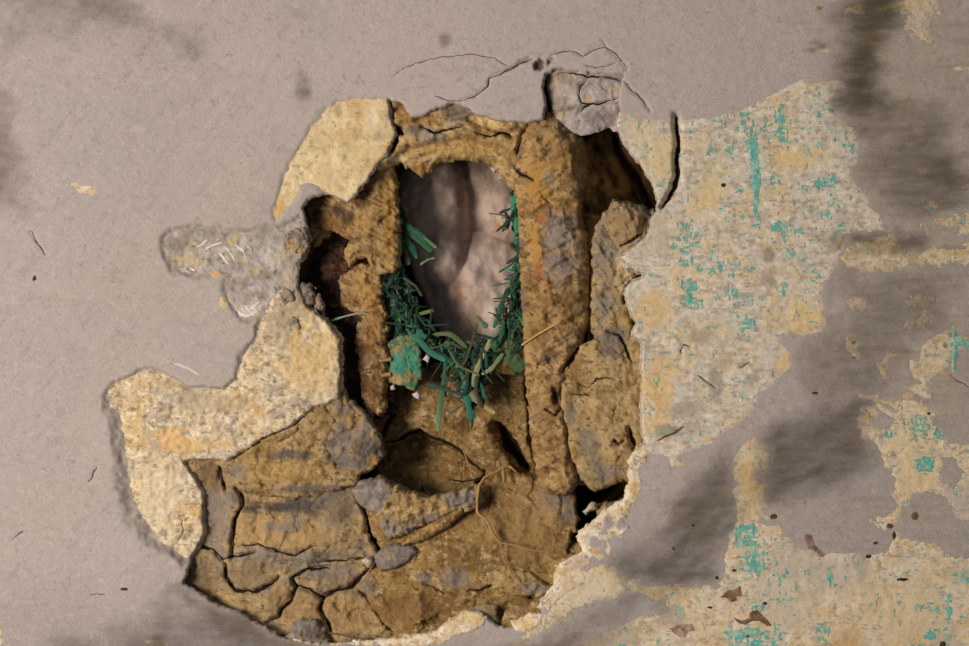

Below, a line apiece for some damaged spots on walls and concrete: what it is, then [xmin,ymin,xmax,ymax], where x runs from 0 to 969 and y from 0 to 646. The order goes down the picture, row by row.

crack [394,39,650,113]
damp [845,0,892,108]
peeling [881,0,941,48]
crack [392,117,511,151]
crack [663,118,680,207]
peeling [106,98,398,558]
spalling [400,248,446,368]
peeling [509,61,969,646]
crack [382,413,491,514]
crack [178,416,392,631]
spalling [293,610,488,646]